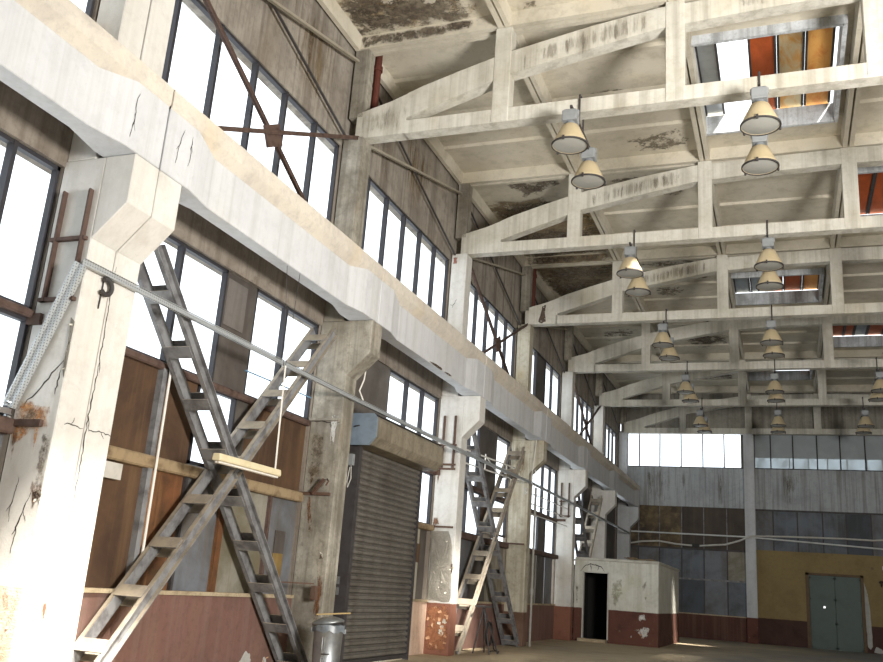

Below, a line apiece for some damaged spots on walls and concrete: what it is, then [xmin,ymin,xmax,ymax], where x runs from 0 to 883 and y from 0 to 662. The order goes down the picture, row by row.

mould [339,0,474,48]
damp [630,130,687,150]
damp [490,180,559,220]
damp [516,220,567,241]
damp [582,212,601,236]
crack [64,267,117,529]
corrosion [12,402,48,451]
flaking render [425,531,454,652]